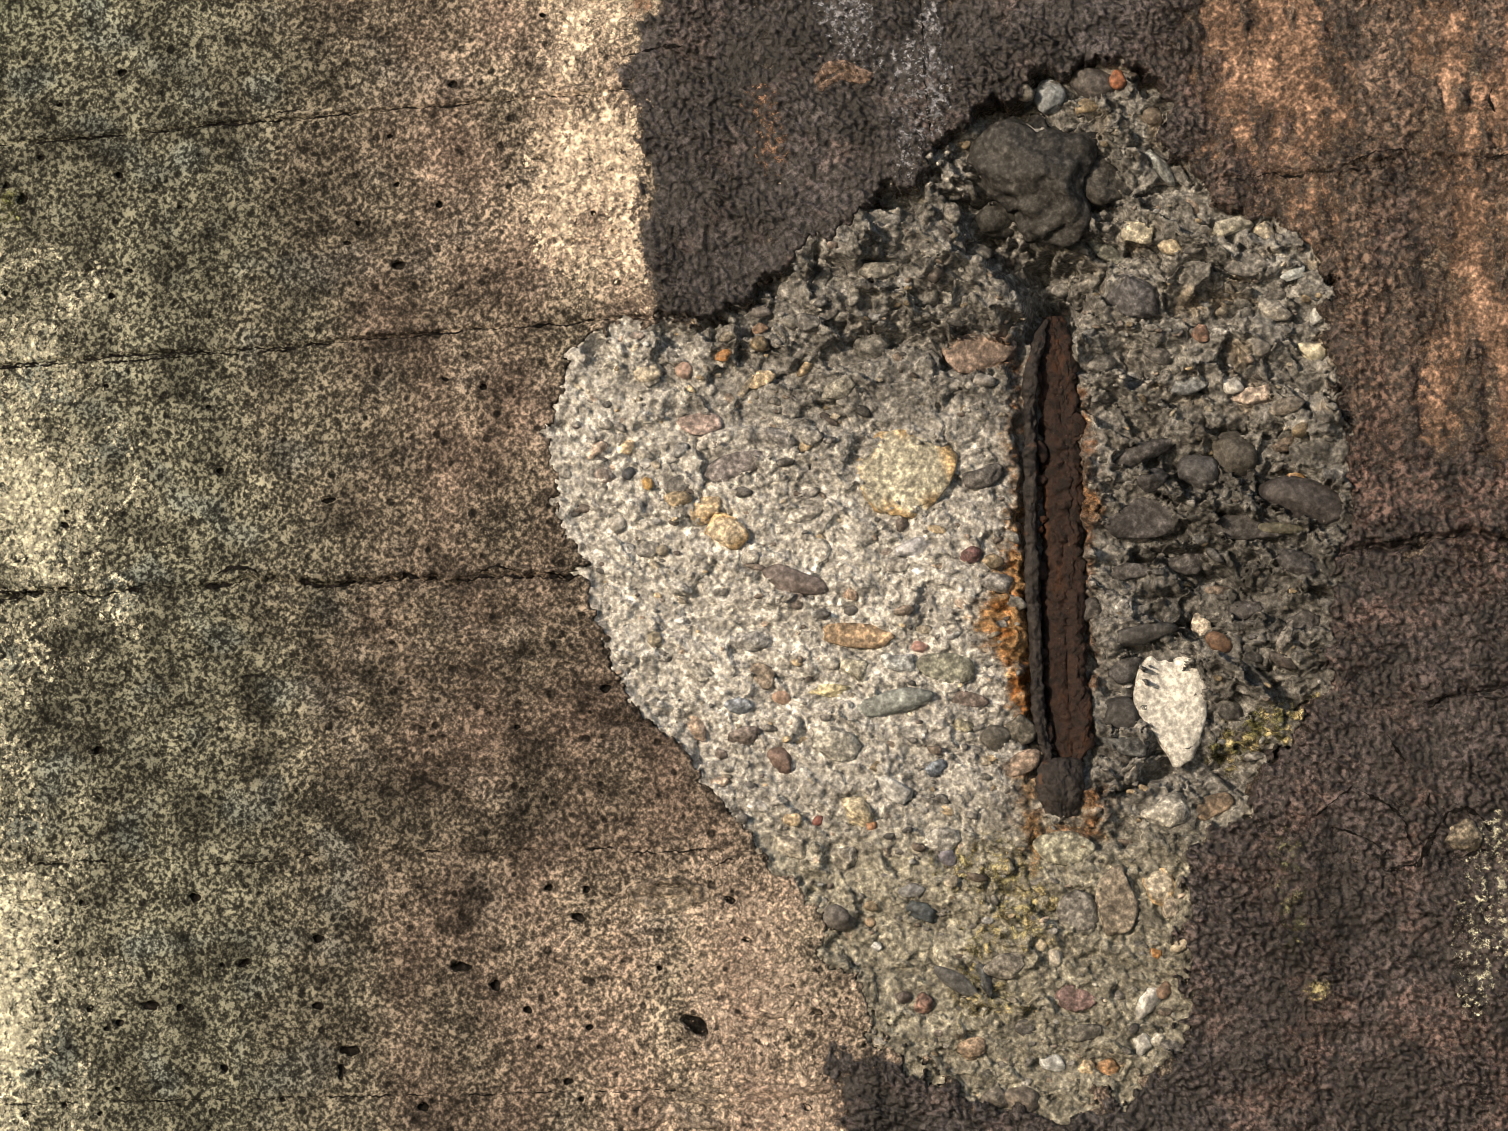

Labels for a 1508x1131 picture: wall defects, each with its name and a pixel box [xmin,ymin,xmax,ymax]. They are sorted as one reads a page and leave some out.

crack [0,552,579,604]
spalling [539,0,1359,1125]
corrosion [974,439,1057,758]
corrosion [1072,387,1105,597]
crack [1336,529,1508,557]
corrosion [1009,765,1108,863]